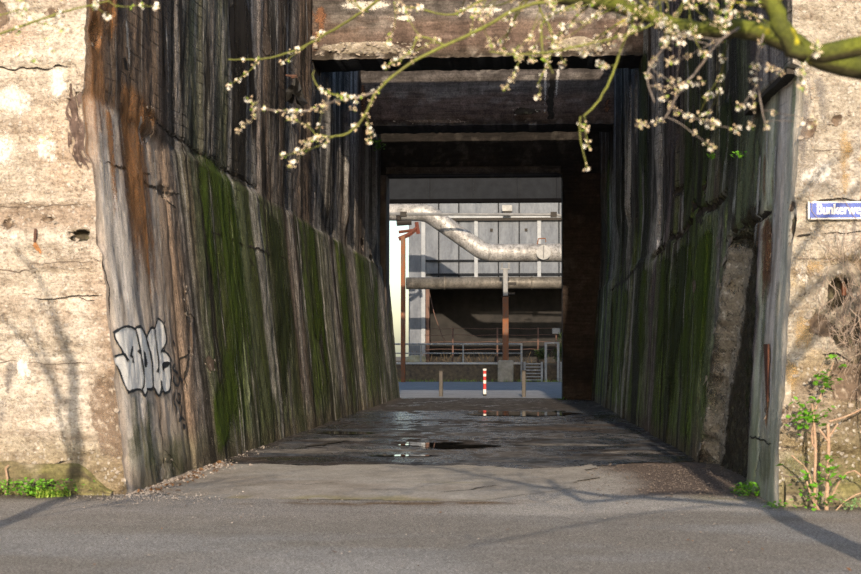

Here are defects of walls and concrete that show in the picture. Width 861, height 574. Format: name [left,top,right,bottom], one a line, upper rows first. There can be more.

crack [0,63,70,71]
rust [82,0,155,298]
crack [0,261,110,312]
spalling [69,229,90,242]
damp [197,154,271,424]
damp [267,207,381,403]
damp [603,27,718,413]
rust [757,216,772,302]
spalling [800,261,861,347]
spalling [830,358,861,408]
crack [749,435,839,478]